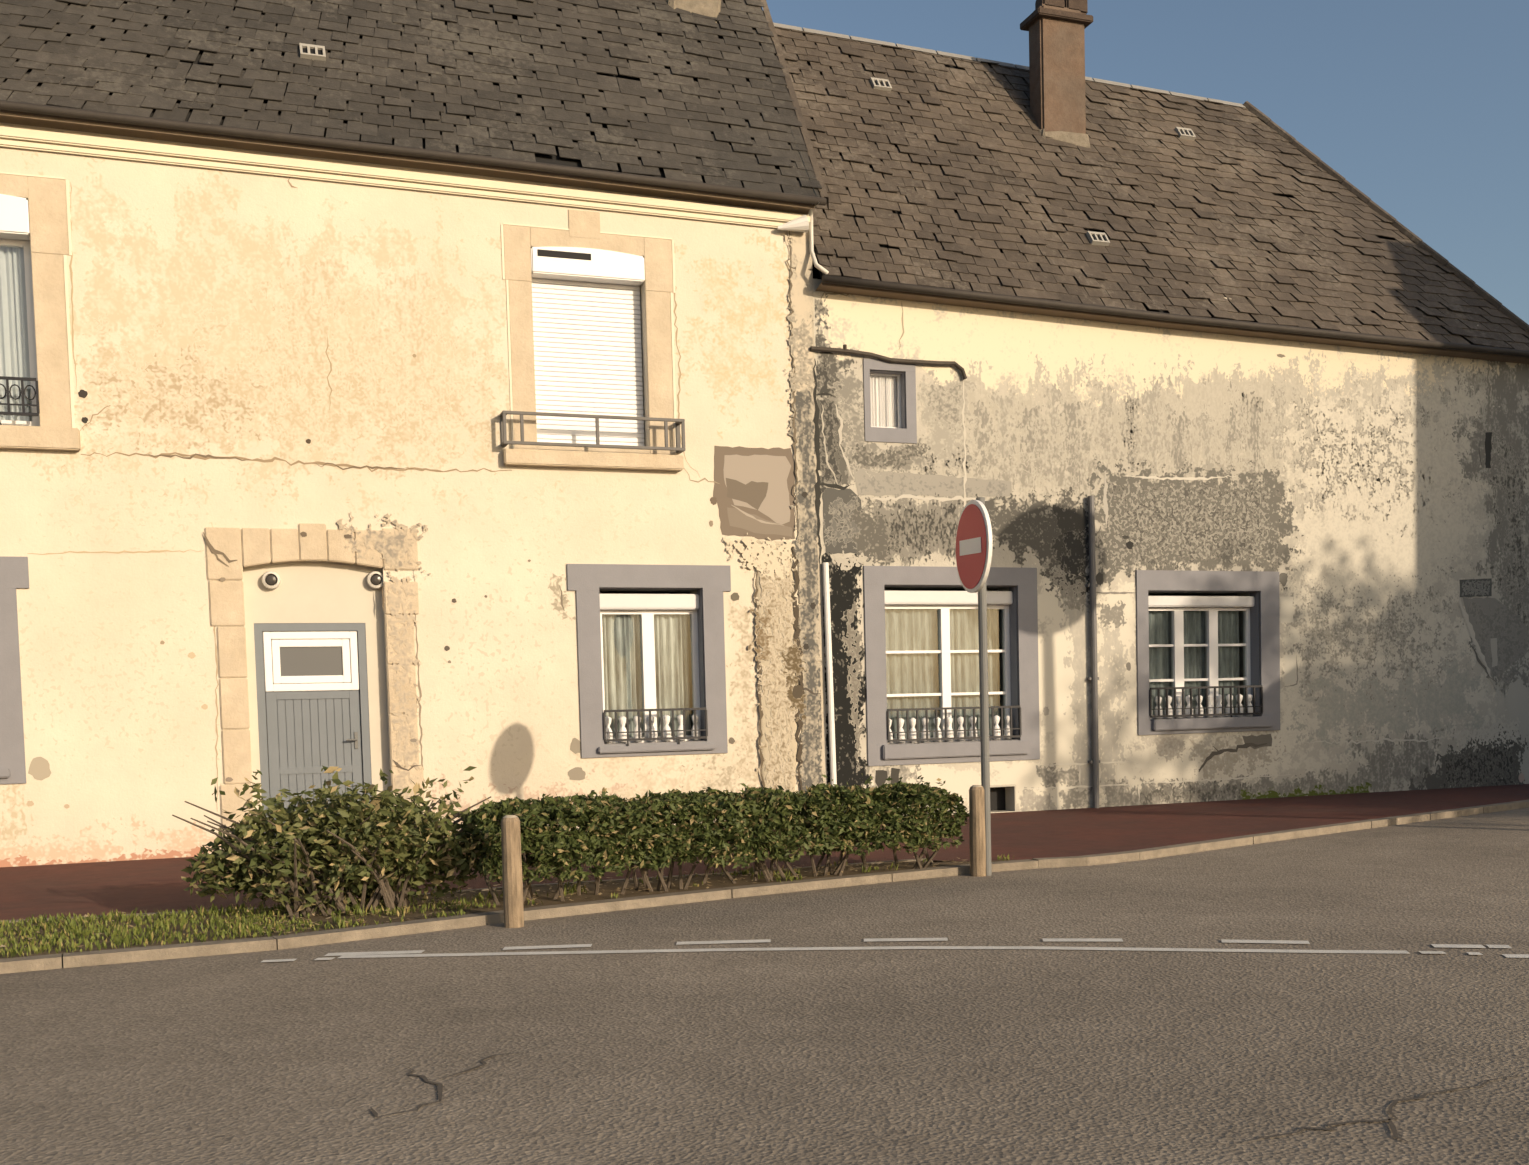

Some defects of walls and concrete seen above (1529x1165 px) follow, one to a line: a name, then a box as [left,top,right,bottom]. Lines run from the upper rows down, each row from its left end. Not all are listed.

flaking render [802,395,851,498]
flaking render [832,551,874,573]
flaking render [1280,596,1293,623]
peeling [1242,734,1272,749]
peeling [1450,717,1522,752]
peeling [875,768,900,787]